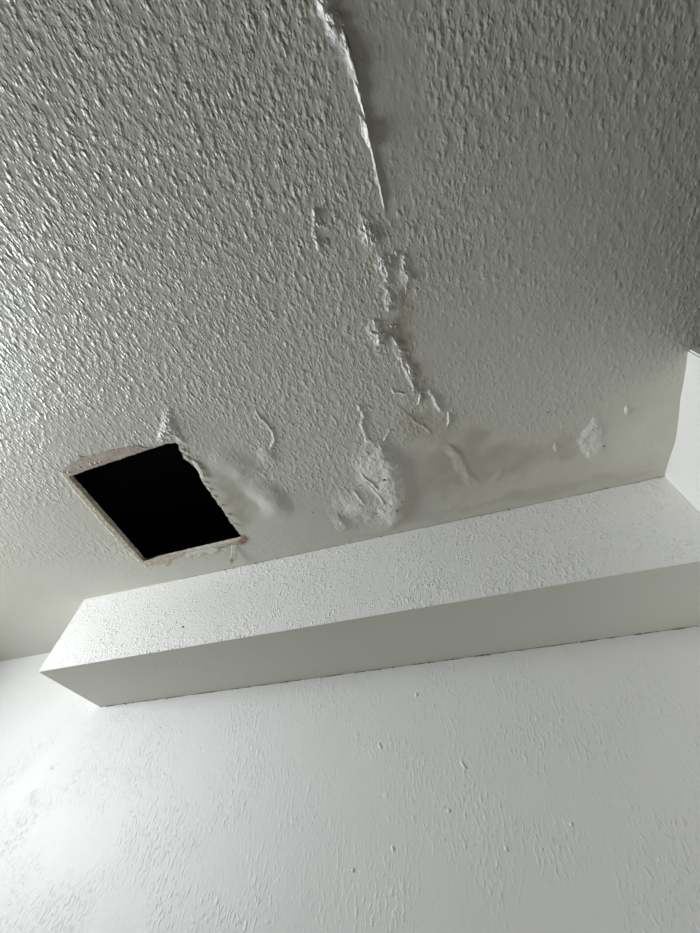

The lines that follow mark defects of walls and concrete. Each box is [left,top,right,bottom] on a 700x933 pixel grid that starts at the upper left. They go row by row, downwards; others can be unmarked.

crack [339,23,386,212]
peeling [366,316,416,380]
peeling [576,414,604,462]